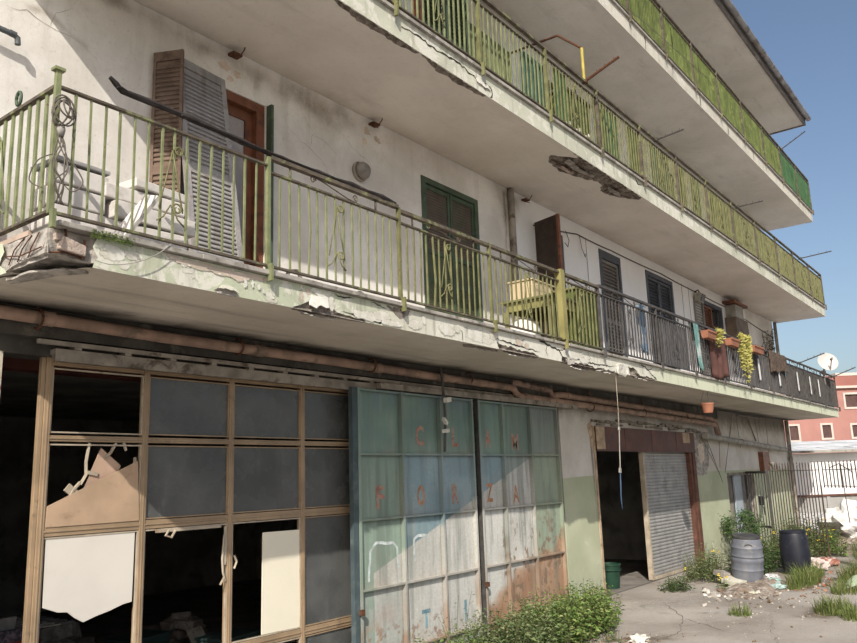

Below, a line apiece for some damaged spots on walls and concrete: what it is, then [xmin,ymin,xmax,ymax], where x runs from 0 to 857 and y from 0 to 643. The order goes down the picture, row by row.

crack [401,26,493,98]
spalling [548,154,642,200]
spalling [0,227,143,284]
spalling [167,254,426,330]
peeling [439,324,539,358]
spalling [562,350,656,381]